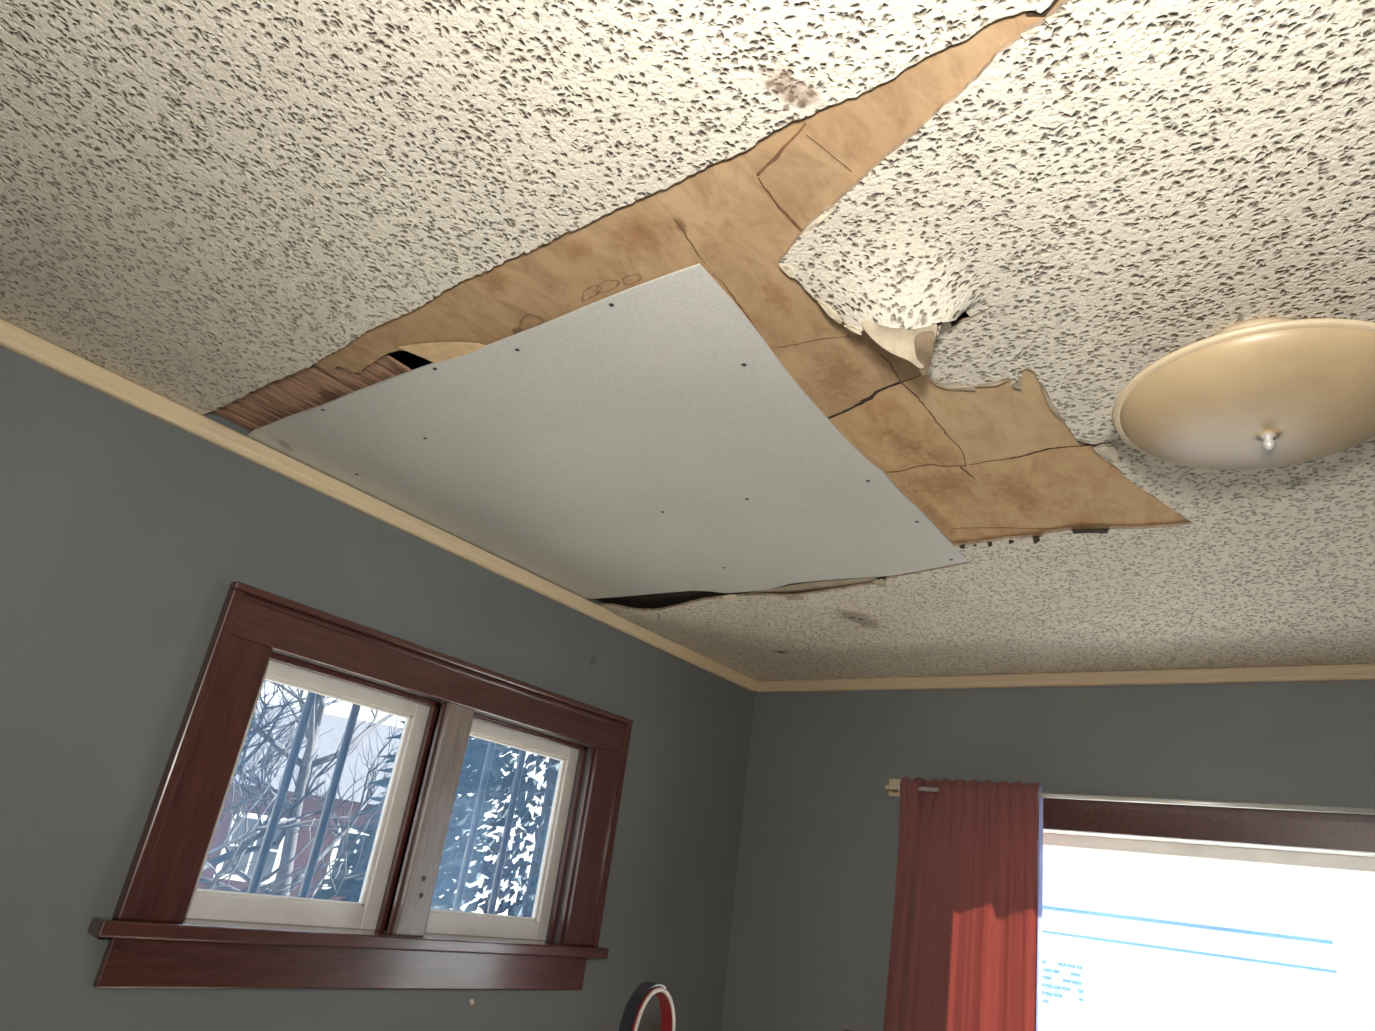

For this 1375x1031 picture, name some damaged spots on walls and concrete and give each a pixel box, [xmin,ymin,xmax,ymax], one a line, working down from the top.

peeling [211,0,1189,549]